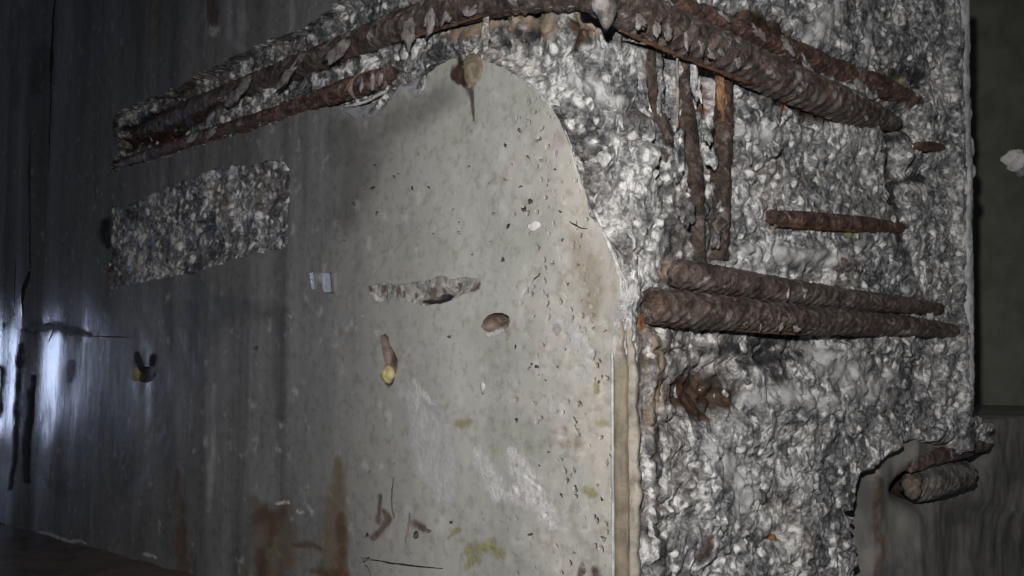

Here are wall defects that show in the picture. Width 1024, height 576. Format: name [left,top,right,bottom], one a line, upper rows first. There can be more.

corrosion [449,14,555,39]
corrosion [569,11,600,52]
corrosion [734,9,792,37]
corrosion [123,100,226,149]
spalling [111,0,580,172]
corrosion [691,88,711,118]
corrosion [755,91,828,121]
spalling [107,160,292,289]
spalling [369,276,481,306]
spalling [488,0,995,576]
corrosion [669,374,733,421]
corrosion [889,463,912,500]